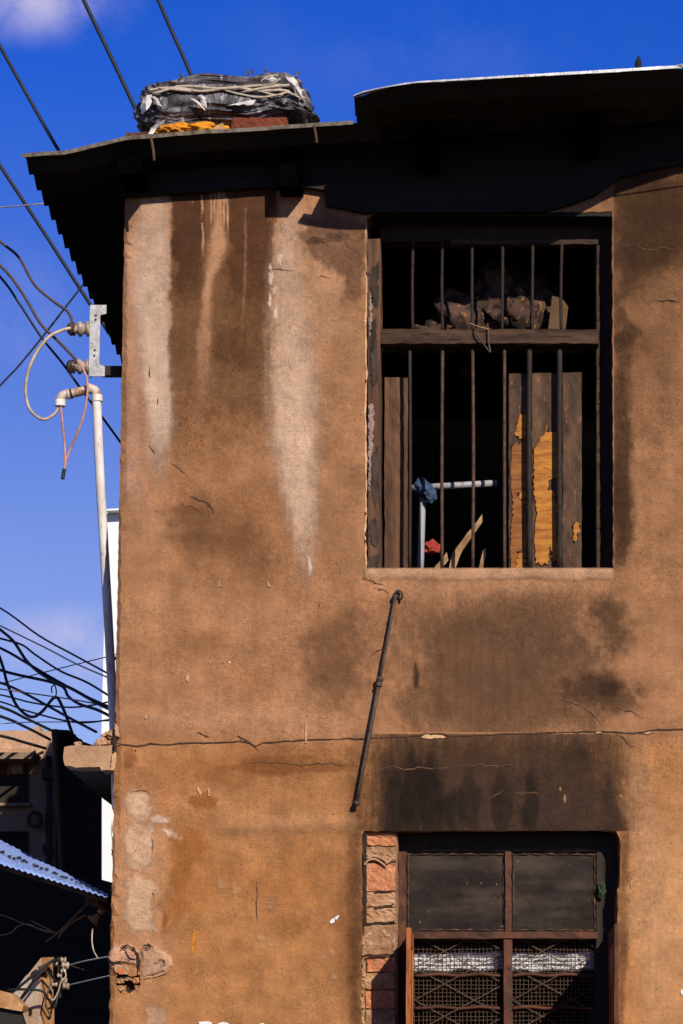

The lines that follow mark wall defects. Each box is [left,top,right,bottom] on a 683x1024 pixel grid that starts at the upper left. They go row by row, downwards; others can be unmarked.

damp [127,189,366,574]
crack [149,445,214,513]
damp [405,603,634,732]
crack [110,712,683,799]
spalling [109,790,158,993]